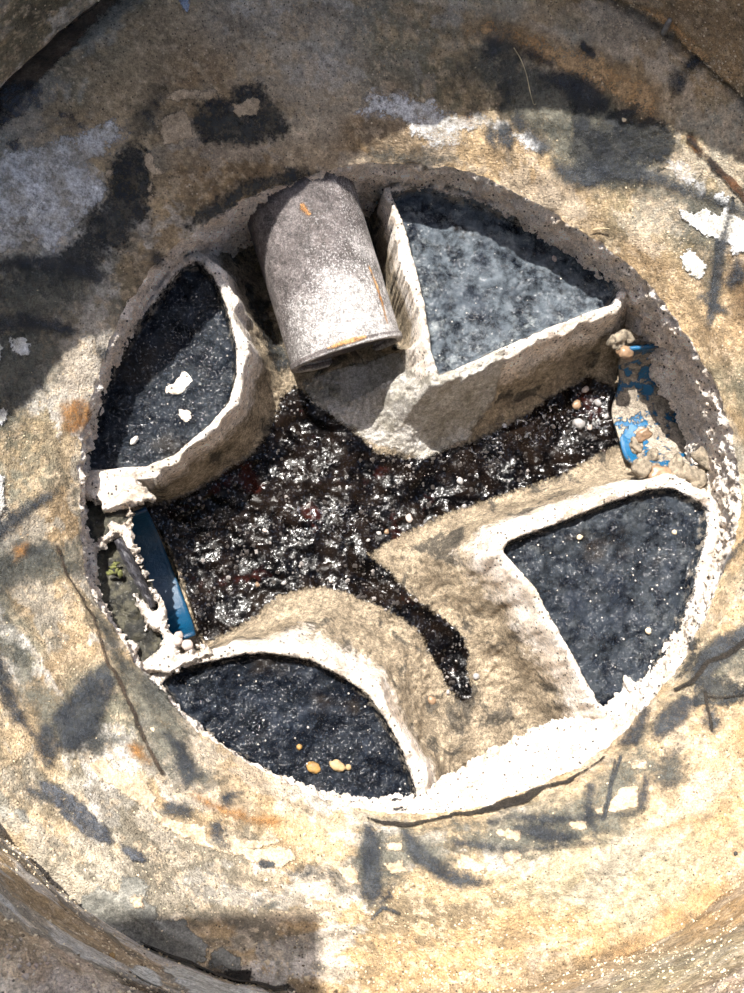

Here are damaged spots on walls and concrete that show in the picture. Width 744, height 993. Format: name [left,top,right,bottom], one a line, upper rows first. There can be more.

crack [482,37,552,65]
crack [580,41,596,58]
leakage [184,167,320,231]
leakage [356,32,744,325]
crack [142,942,296,993]